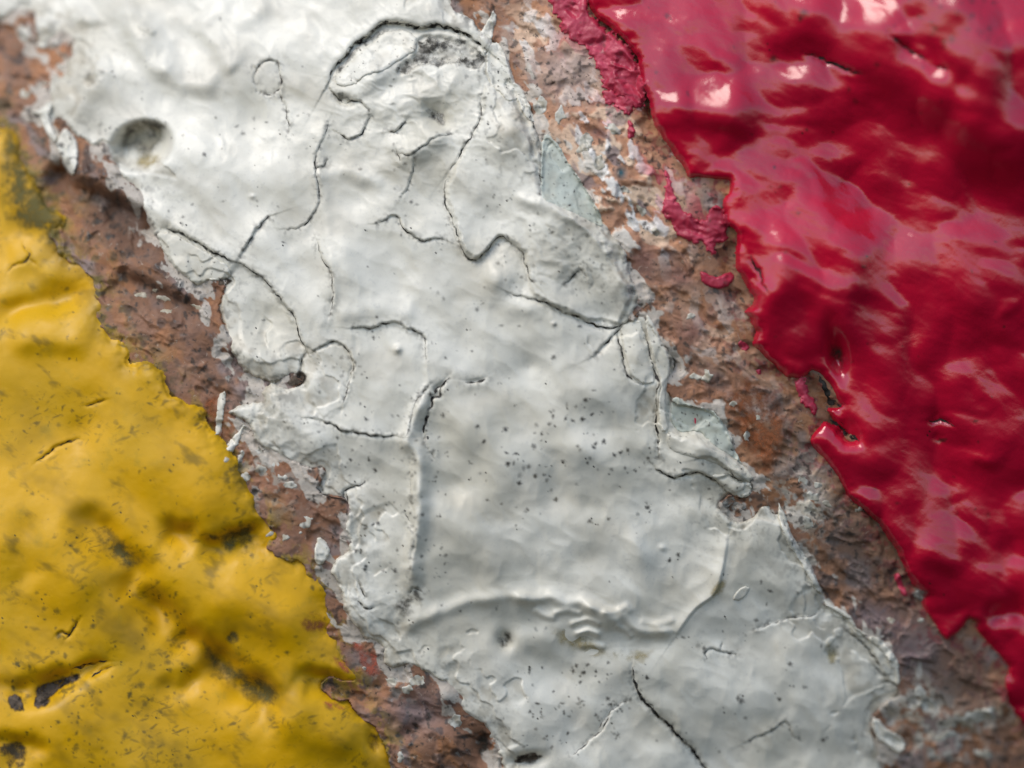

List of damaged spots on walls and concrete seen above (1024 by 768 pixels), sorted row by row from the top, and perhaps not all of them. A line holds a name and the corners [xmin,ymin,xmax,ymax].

peeling [328,11,566,124]
peeling [31,101,78,176]
crack [314,90,370,196]
peeling [157,232,232,285]
crack [168,216,485,438]
crack [381,108,747,499]
peeling [215,391,297,489]
peeling [620,315,753,518]
corrosion [732,383,782,470]
crack [819,376,859,441]
spalling [8,674,79,711]
crack [578,667,706,768]